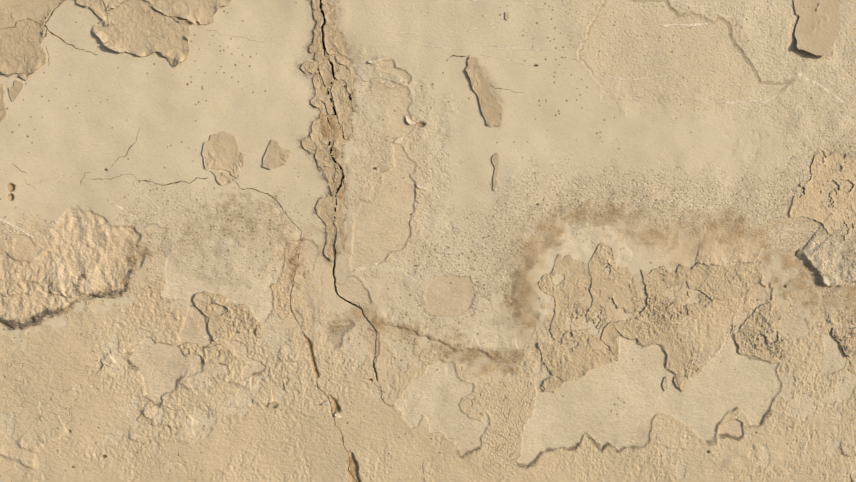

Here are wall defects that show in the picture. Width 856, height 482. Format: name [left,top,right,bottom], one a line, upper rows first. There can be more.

peeling [0,0,63,121]
peeling [76,0,231,67]
peeling [793,0,841,57]
peeling [202,131,245,186]
peeling [262,140,290,169]
crack [318,0,394,407]
peeling [297,0,429,271]
spalling [0,206,146,330]
crack [235,180,362,482]
peeling [363,301,519,456]
peeling [517,316,781,467]
peeling [823,328,856,375]